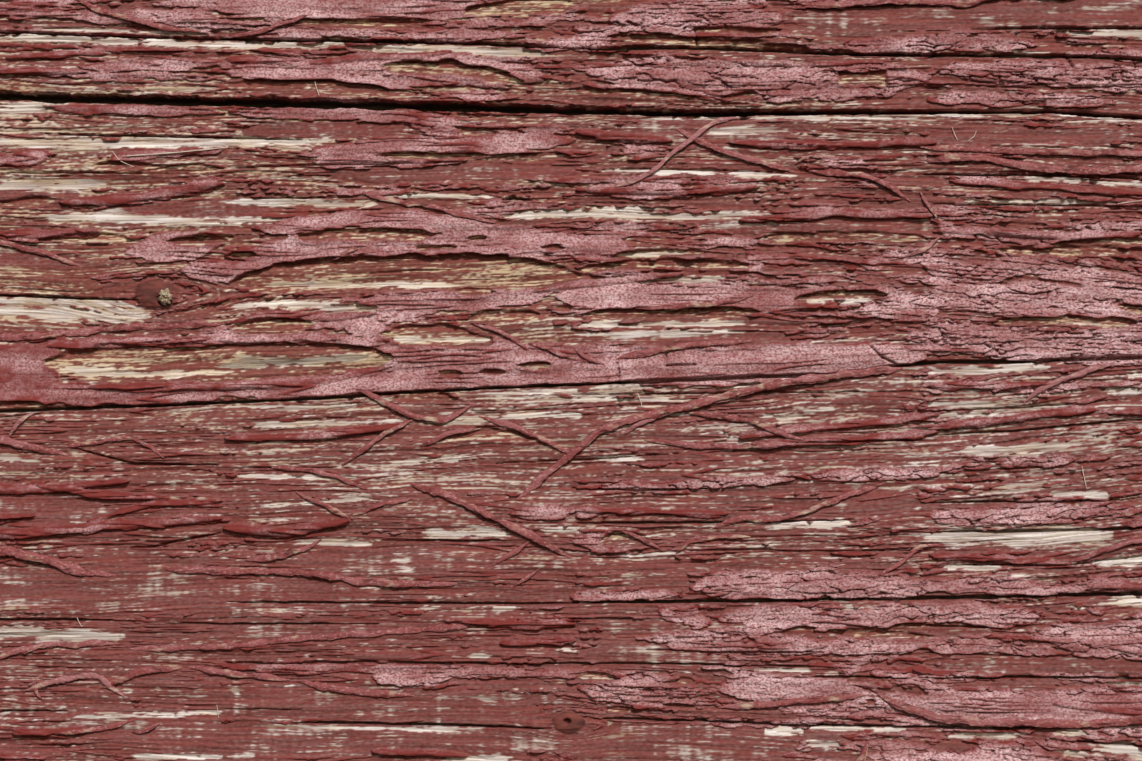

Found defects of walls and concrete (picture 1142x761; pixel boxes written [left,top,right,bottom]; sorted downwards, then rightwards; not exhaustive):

crack [70,132,236,140]
peeling [121,114,573,160]
crack [0,93,988,118]
crack [1022,112,1138,120]
peeling [0,177,223,228]
peeling [225,233,819,313]
peeling [0,283,1142,404]
crack [0,382,650,413]
crack [810,358,1065,393]
peeling [924,489,1134,548]
peeling [692,569,939,610]
peeling [718,676,1142,737]